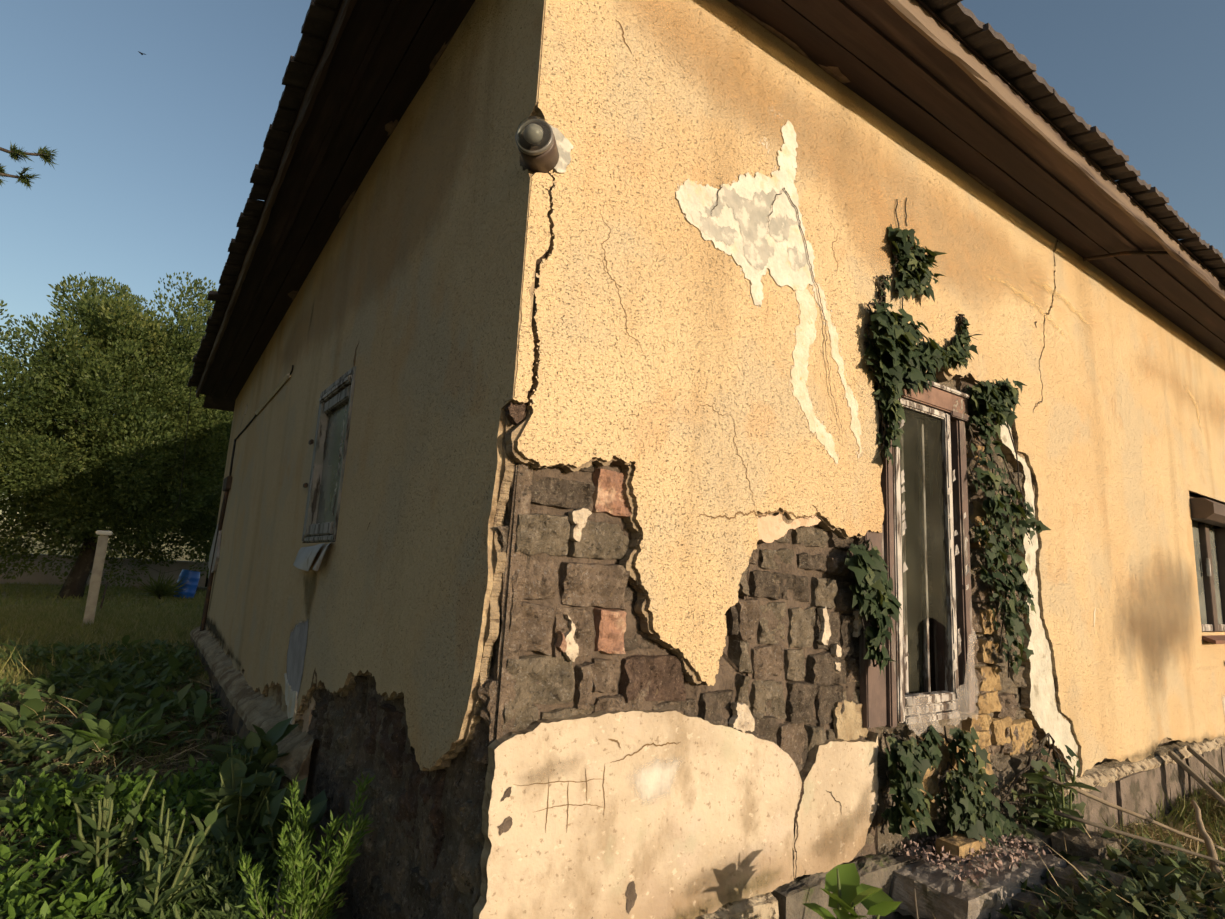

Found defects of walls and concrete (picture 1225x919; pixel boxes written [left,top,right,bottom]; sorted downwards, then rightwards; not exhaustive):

peeling [690,185,808,271]
crack [523,172,557,420]
crack [697,404,818,520]
flaking render [284,372,1079,919]
crack [794,782,842,880]